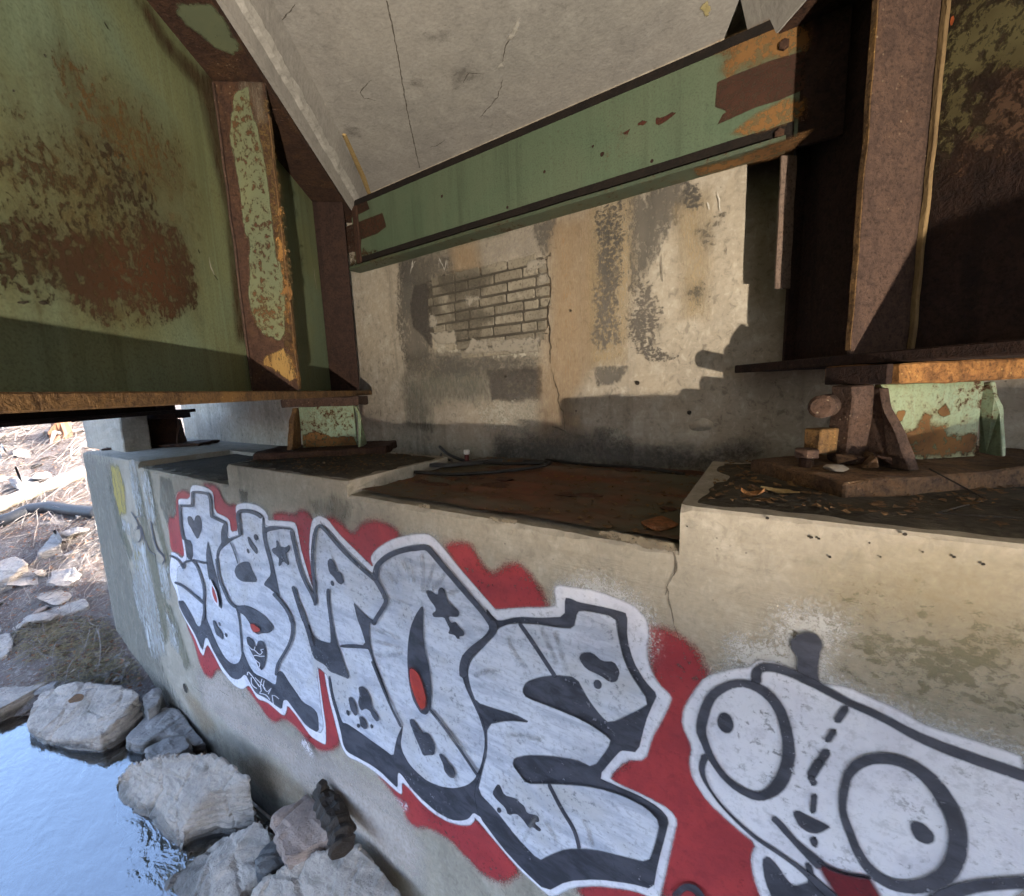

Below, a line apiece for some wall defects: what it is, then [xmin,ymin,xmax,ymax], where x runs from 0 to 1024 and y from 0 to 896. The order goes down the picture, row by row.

corrosion [0,109,198,328]
corrosion [136,0,301,389]
crack [386,0,442,168]
spalling [426,254,552,359]
crack [463,24,516,118]
crack [544,253,566,433]
damp [396,253,757,470]
damp [590,181,704,362]
peeling [623,112,675,135]
corrosion [717,23,813,77]
corrosion [905,413,980,460]
crack [665,552,679,638]